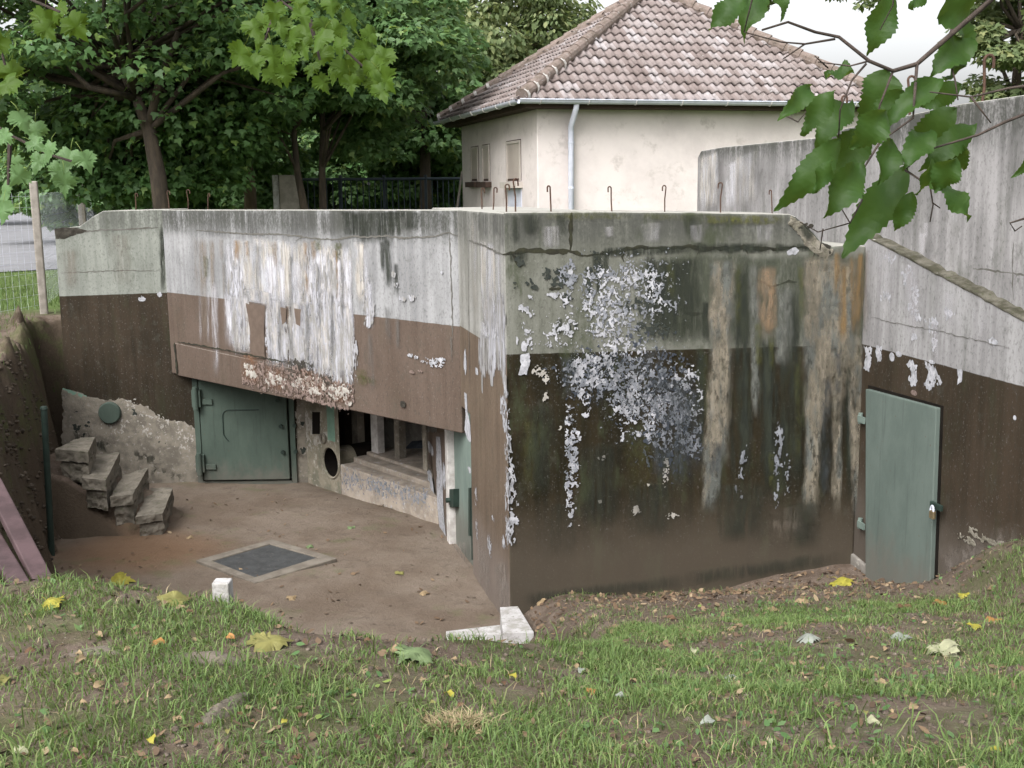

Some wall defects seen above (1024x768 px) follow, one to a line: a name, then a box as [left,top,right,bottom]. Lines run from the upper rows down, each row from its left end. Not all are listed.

peeling [227,247,375,483]
leakage [200,212,418,376]
peeling [407,353,445,374]
crack [196,212,815,335]
leakage [513,215,536,239]
peeling [464,247,709,554]
leakage [587,225,867,504]
peeling [864,252,955,396]